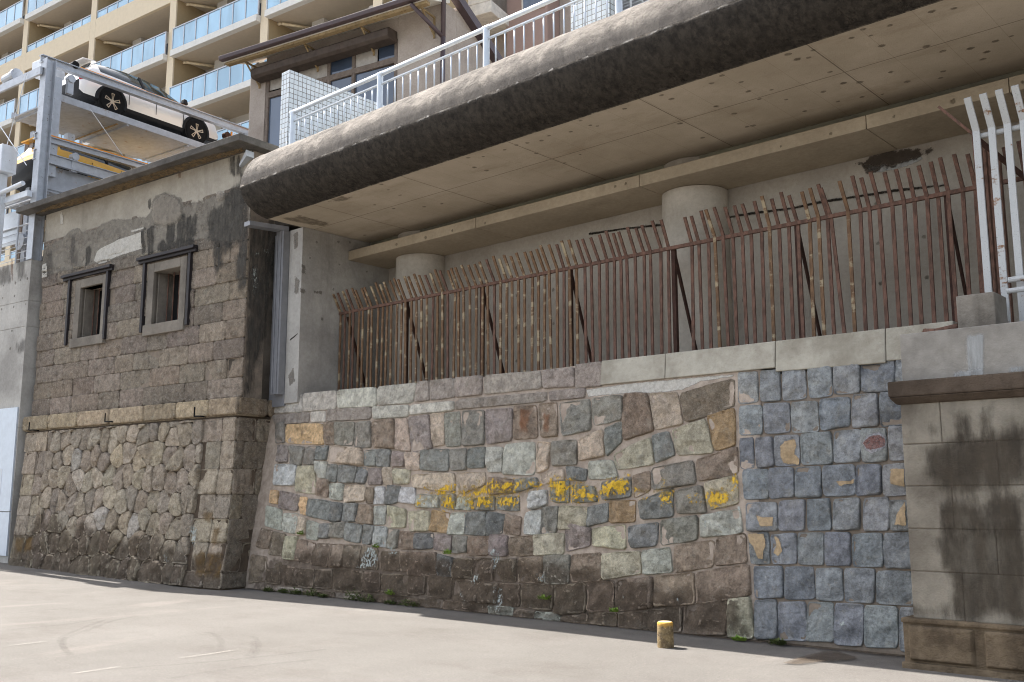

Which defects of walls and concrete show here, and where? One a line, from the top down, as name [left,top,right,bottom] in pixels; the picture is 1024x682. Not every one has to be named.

flaking render [36,148,244,278]
water stain [141,155,276,393]
water stain [928,420,1024,619]